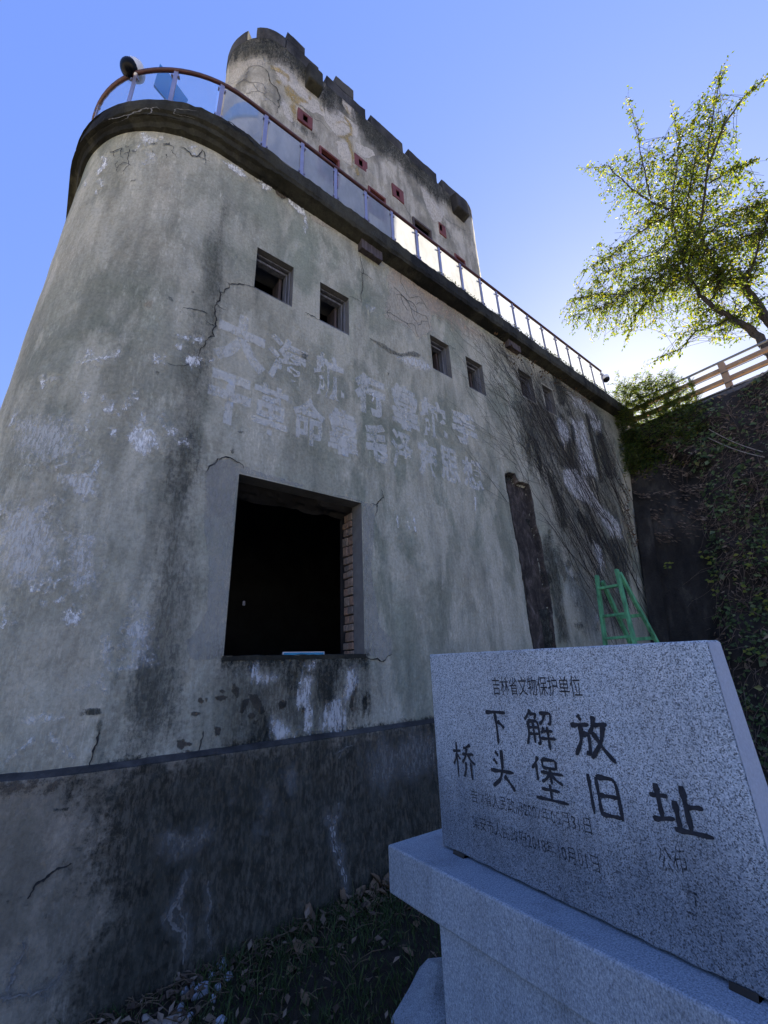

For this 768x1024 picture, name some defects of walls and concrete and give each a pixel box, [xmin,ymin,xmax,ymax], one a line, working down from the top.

crack [236,65,325,126]
crack [170,282,255,367]
crack [206,450,244,472]
peeling [191,684,265,724]
crack [89,730,100,765]
water stain [0,461,442,1024]
crack [27,863,72,899]